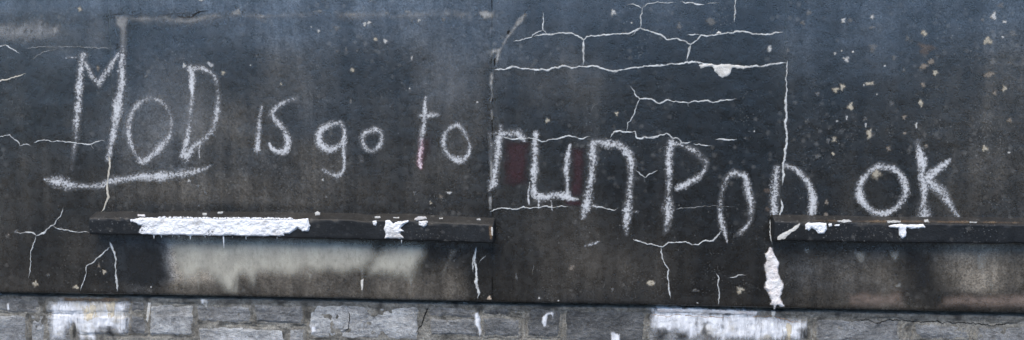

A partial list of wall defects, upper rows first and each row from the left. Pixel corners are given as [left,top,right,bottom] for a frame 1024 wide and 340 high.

crack [0,45,109,82]
crack [492,0,788,242]
crack [0,134,118,291]
damp [127,216,428,290]
crack [633,205,801,323]